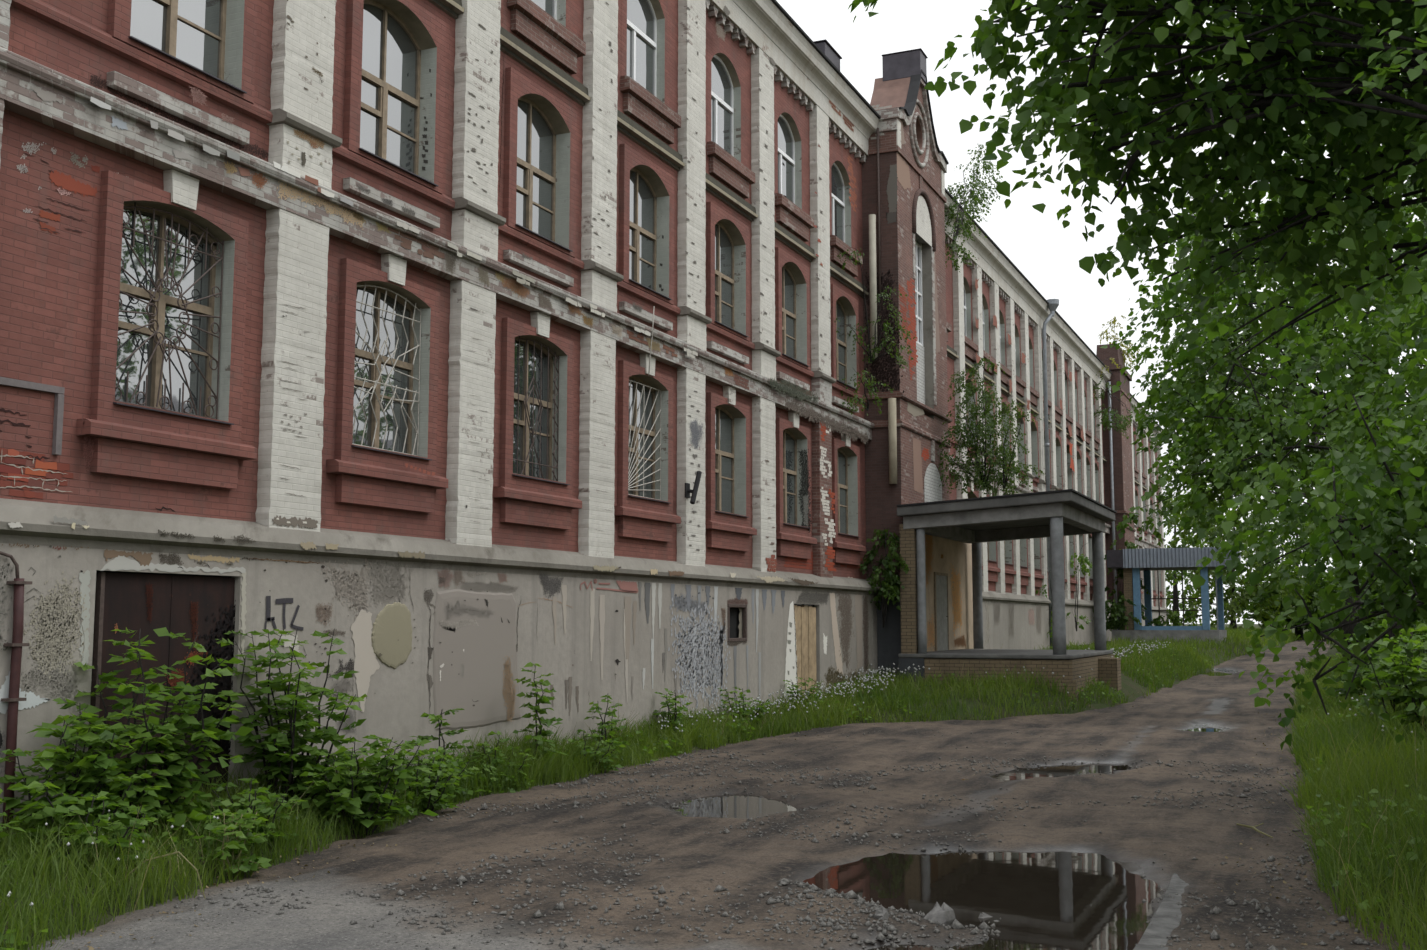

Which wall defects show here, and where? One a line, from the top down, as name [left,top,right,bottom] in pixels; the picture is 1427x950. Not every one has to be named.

spalling [17,142,100,197]
flaking render [287,141,323,193]
peeling [467,91,493,192]
flaking render [388,227,445,259]
flaking render [0,448,73,499]
damp [590,588,605,680]
damp [623,582,870,702]
damp [20,653,85,713]